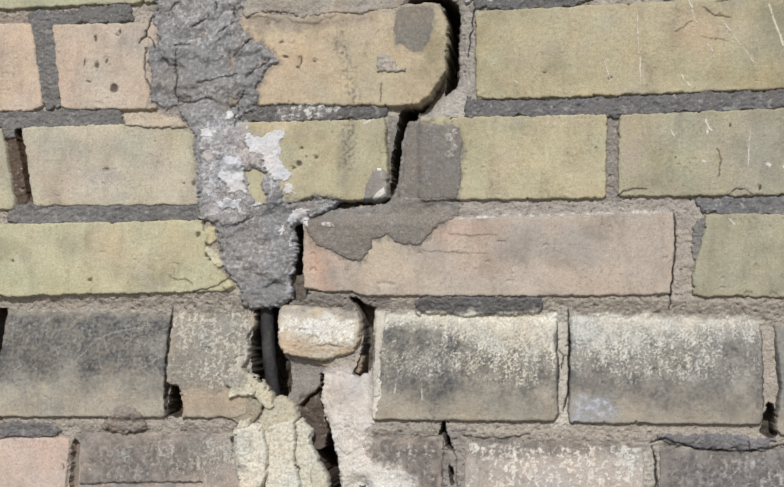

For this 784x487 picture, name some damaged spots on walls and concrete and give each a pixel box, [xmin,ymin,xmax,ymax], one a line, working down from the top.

peeling [184,147,248,211]
peeling [245,104,340,195]
crack [336,0,475,209]
spalling [197,226,223,268]
peeling [278,208,310,247]
crack [289,217,316,303]
crack [163,308,173,418]
spalling [251,310,265,382]
spalling [273,303,293,396]
crack [299,373,342,487]
crack [348,296,377,376]
flaking render [321,310,418,487]